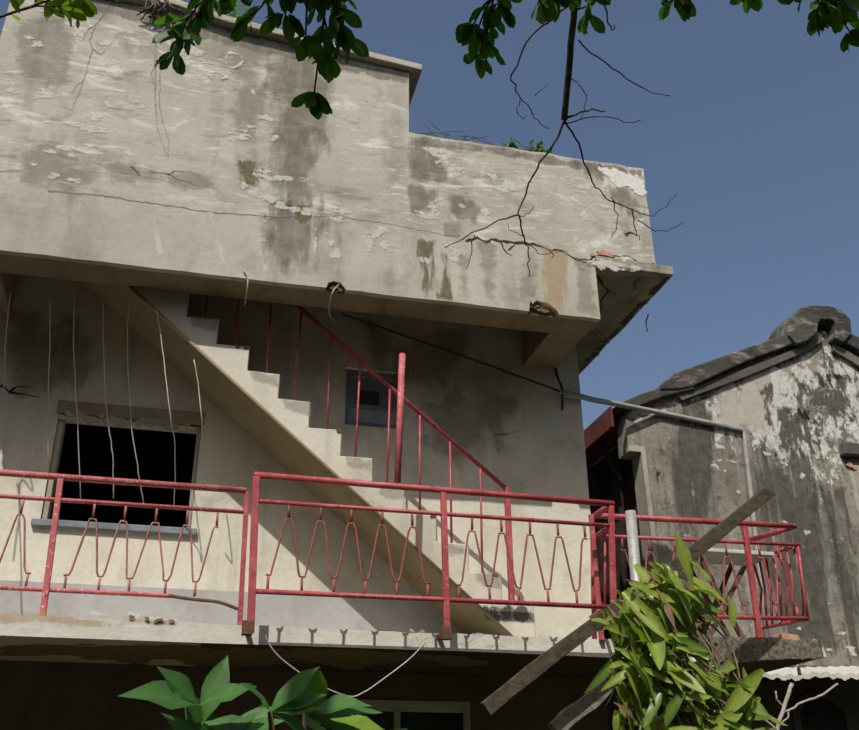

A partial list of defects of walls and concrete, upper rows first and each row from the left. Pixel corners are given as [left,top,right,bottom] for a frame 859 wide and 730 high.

crack [71,11,107,109]
crack [130,26,200,187]
peeling [158,46,214,66]
leakage [199,26,327,267]
crack [48,189,655,310]
leakage [409,137,482,213]
leakage [441,255,452,299]
leakage [453,197,477,220]
spalling [529,303,550,314]
peeling [564,166,647,208]
peeling [626,332,859,501]
leakage [756,349,859,655]